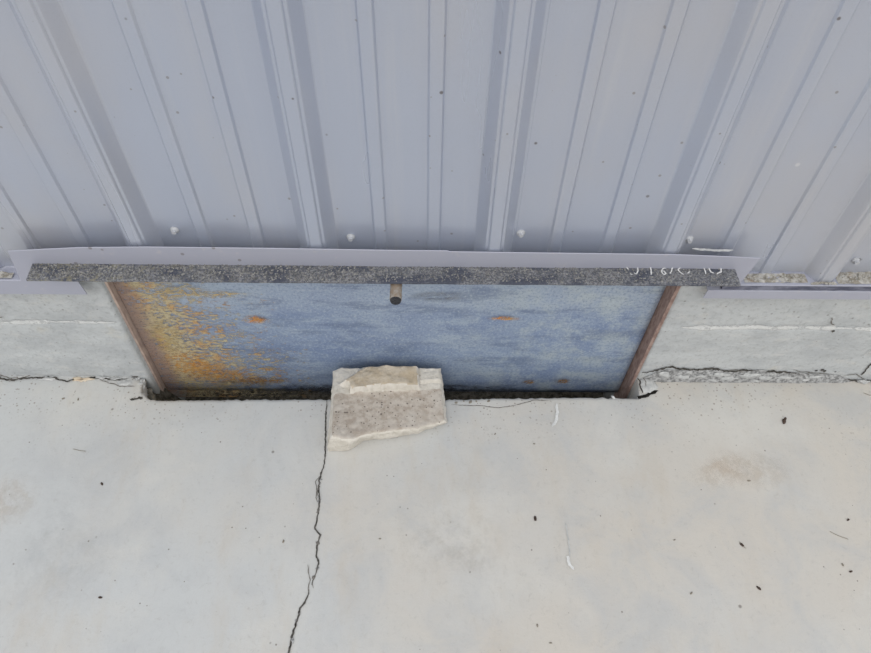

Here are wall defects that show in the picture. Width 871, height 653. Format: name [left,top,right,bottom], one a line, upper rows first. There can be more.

crack [0,375,132,387]
rust [113,282,314,398]
crack [640,363,871,384]
crack [288,401,327,653]